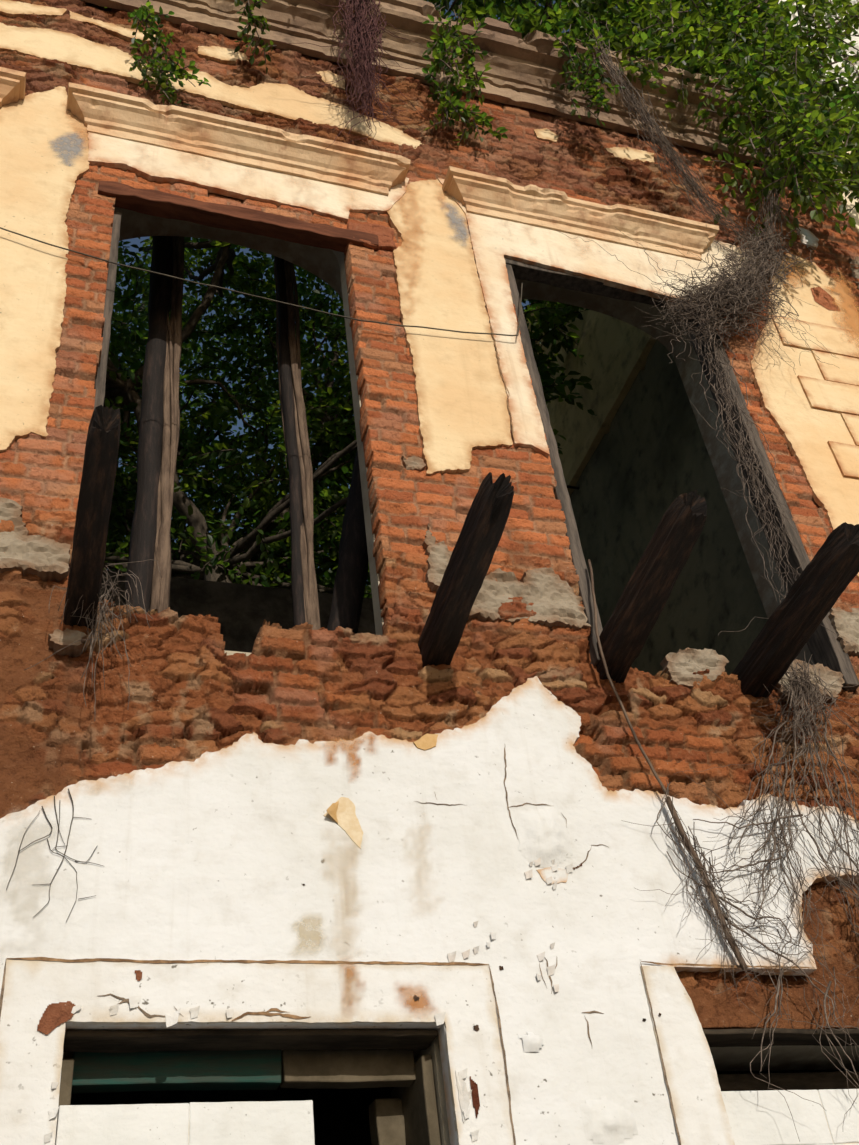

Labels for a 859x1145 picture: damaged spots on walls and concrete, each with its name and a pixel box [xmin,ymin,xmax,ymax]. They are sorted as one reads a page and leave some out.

spalling [0,0,859,562]
spalling [0,165,859,820]
crack [504,748,567,838]
peeling [323,797,363,849]
peeling [524,857,573,890]
peeling [447,932,496,962]
spalling [676,880,859,1029]
spalling [37,1001,82,1034]
peeling [165,1006,200,1027]
rust [400,988,429,1010]
peeling [435,1012,446,1026]
crack [0,957,516,1145]